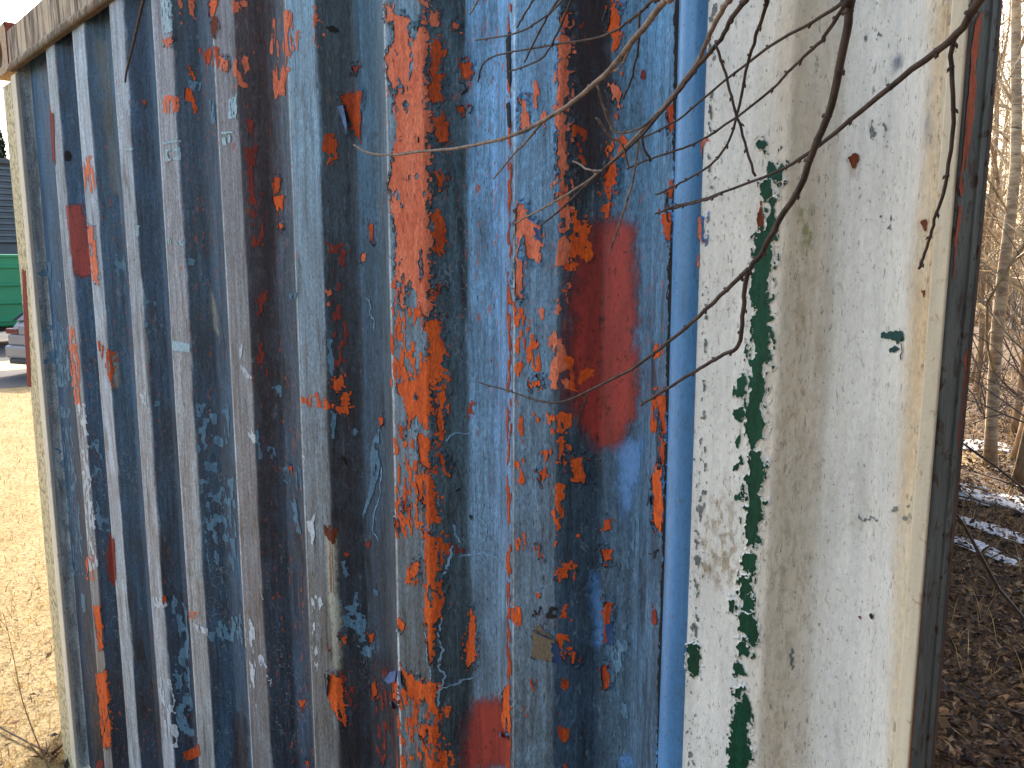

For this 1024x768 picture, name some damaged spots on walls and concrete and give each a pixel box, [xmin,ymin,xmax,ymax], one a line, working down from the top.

peeling [270,9,300,99]
peeling [510,0,645,394]
peeling [68,326,80,405]
peeling [368,0,476,768]
peeling [649,386,668,537]
peeling [730,373,747,471]
peeling [881,330,904,353]
peeling [106,532,116,587]
peeling [511,412,596,626]
peeling [95,668,115,768]
peeling [326,669,357,732]
peeling [724,547,764,768]